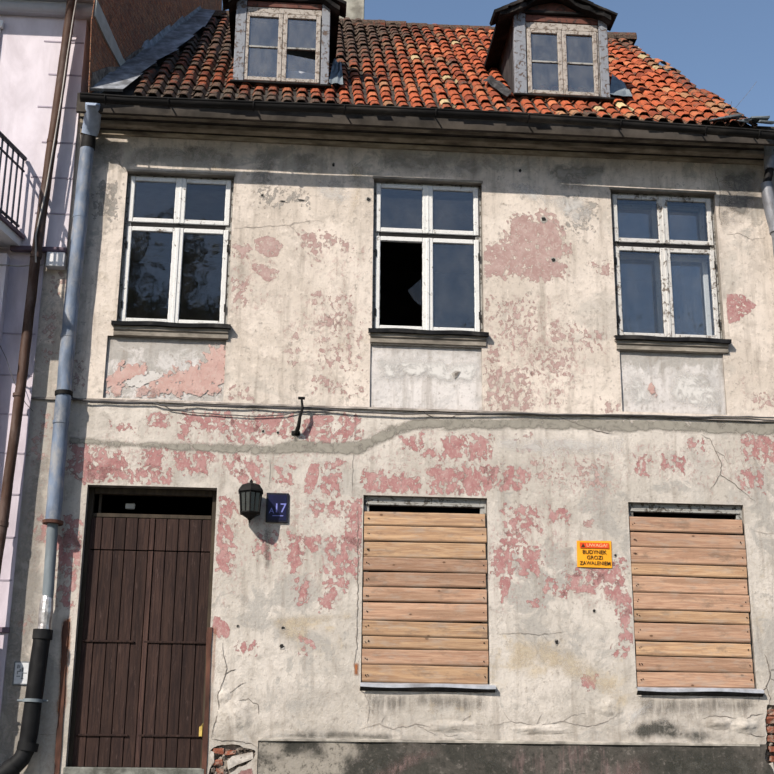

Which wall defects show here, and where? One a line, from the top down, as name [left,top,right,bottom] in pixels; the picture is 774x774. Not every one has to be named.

peeling [484,195,600,283]
peeling [726,294,756,324]
peeling [65,344,364,487]
crack [709,438,755,501]
peeling [54,514,83,607]
peeling [215,492,239,574]
peeling [252,431,633,659]
crack [354,529,617,736]
spalling [209,744,255,774]
crack [211,643,259,747]
spalling [765,705,774,773]